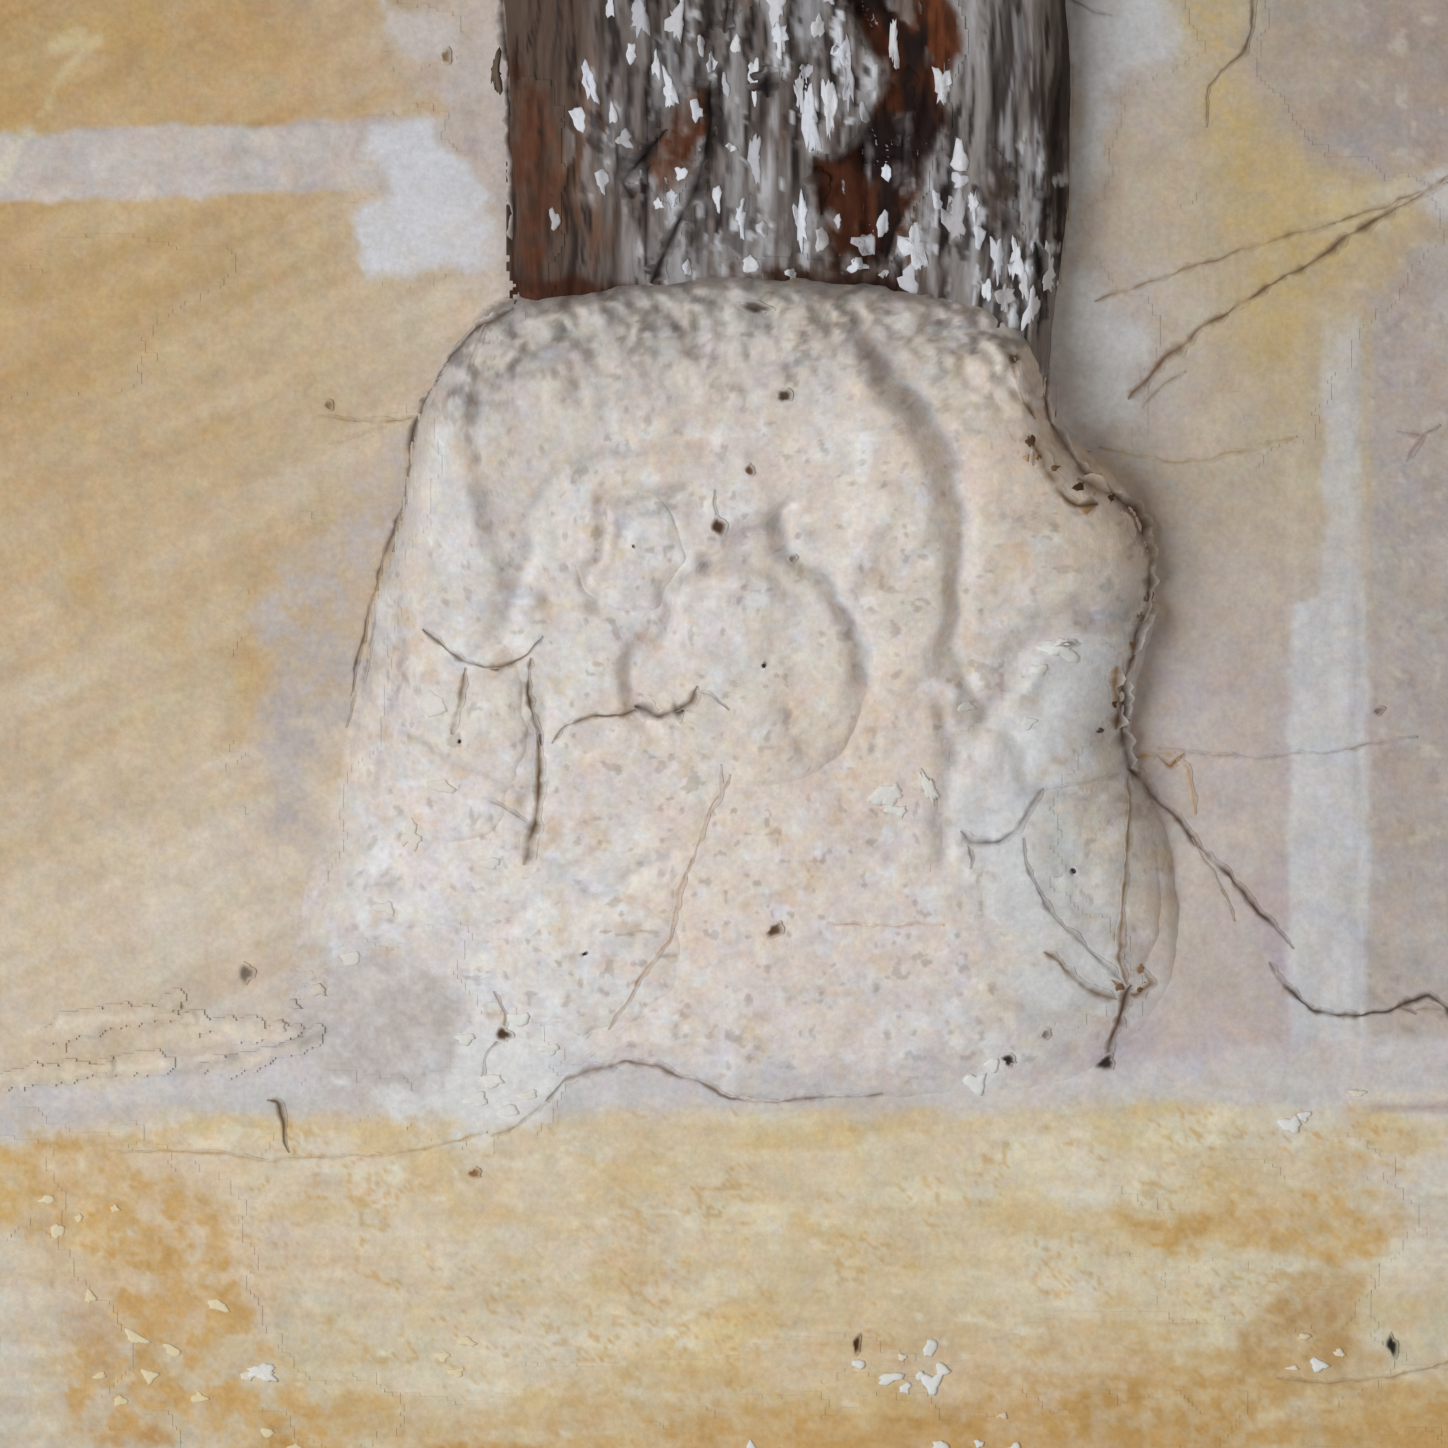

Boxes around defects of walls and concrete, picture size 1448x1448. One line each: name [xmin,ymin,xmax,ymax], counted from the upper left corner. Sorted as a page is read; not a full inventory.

peeling [568,59,634,149]
peeling [626,0,730,123]
peeling [793,0,870,153]
peeling [889,18,900,69]
crack [1204,0,1257,128]
peeling [792,188,929,294]
crack [1027,242,1049,280]
peeling [932,0,1205,459]
crack [1094,173,1448,409]
crack [422,628,729,866]
crack [960,357,1448,1056]
crack [110,764,882,1163]